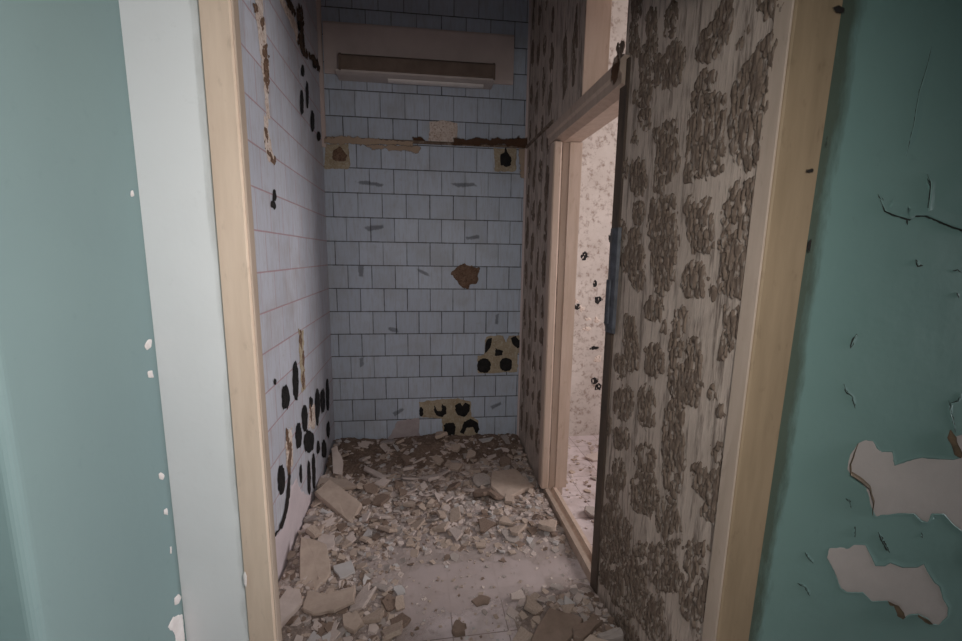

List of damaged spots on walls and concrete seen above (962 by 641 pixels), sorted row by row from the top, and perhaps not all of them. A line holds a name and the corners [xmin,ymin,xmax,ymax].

spalling [280,0,320,73]
peeling [324,144,350,169]
peeling [493,148,525,178]
spalling [451,263,480,289]
spalling [298,328,306,392]
peeling [477,335,520,374]
spalling [308,404,316,429]
peeling [388,398,479,439]
spalling [275,428,318,583]
peeling [846,430,962,537]
peeling [826,543,953,628]
peeling [168,594,185,641]